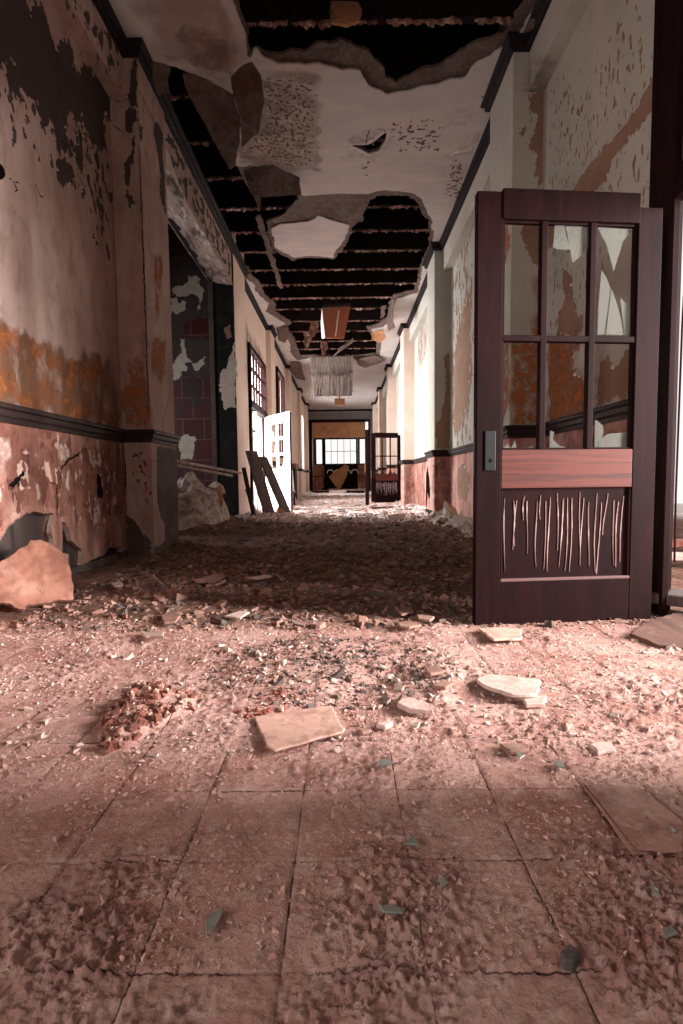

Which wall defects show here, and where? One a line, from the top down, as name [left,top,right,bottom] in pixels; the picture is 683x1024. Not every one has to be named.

peeling [0,0,231,276]
peeling [519,18,653,204]
rust [0,330,165,428]
peeling [169,254,238,410]
peeling [435,231,474,450]
crack [50,449,84,510]
flaking render [0,431,197,566]